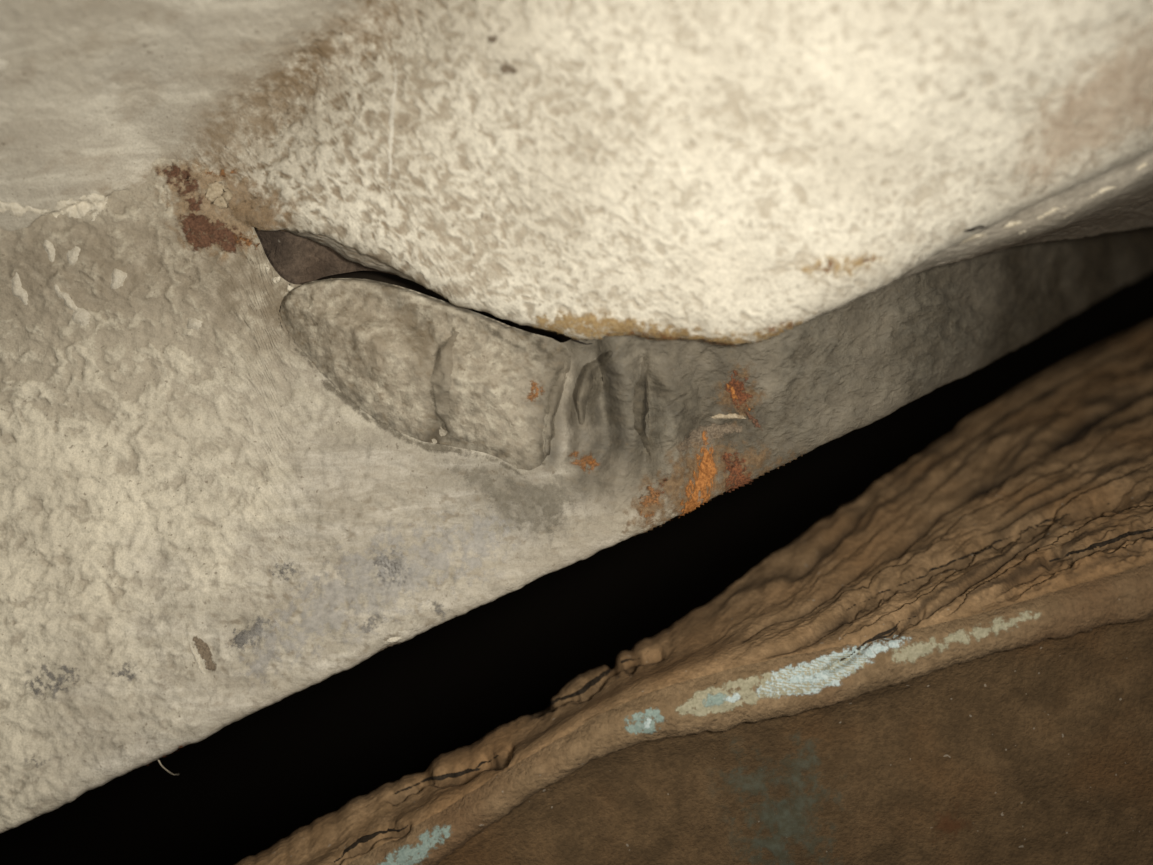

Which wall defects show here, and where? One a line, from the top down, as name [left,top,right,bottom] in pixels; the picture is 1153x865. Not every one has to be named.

rust [156,162,291,259]
spalling [677,413,746,452]
rust [628,431,797,530]
rust [719,368,762,428]